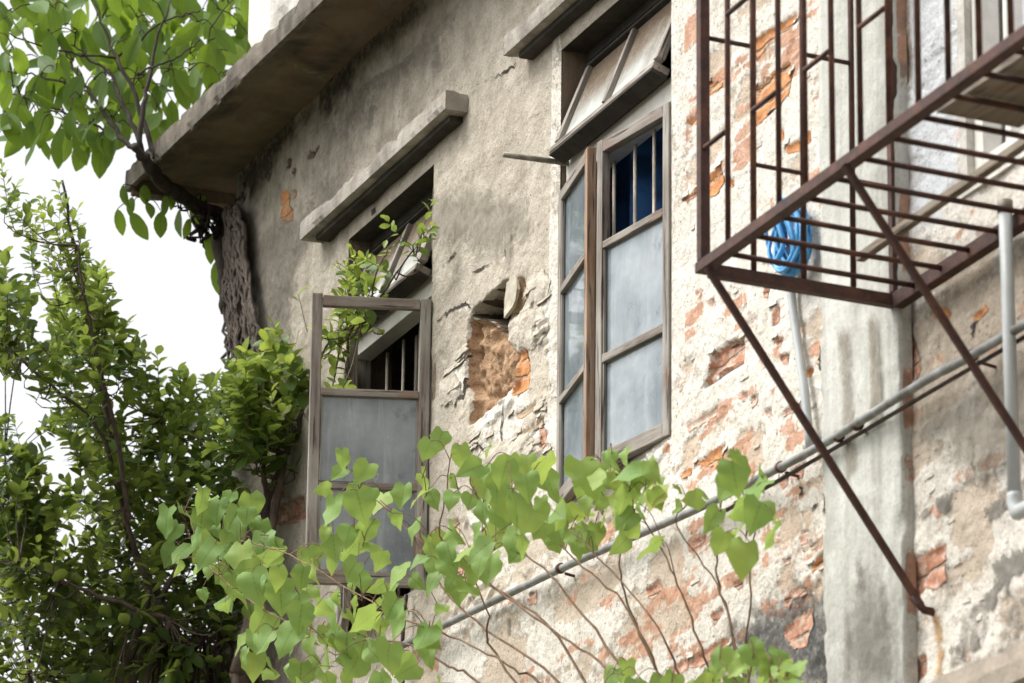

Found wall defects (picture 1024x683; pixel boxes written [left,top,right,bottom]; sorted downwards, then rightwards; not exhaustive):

spalling [756,61,810,126]
damp [240,118,294,197]
spalling [710,158,734,198]
crack [437,301,470,321]
spalling [763,288,790,366]
crack [452,355,473,408]
spalling [442,277,552,458]
spalling [706,332,816,418]
damp [838,332,855,477]
damp [867,320,882,423]
spalling [915,542,960,596]
spalling [783,584,814,649]